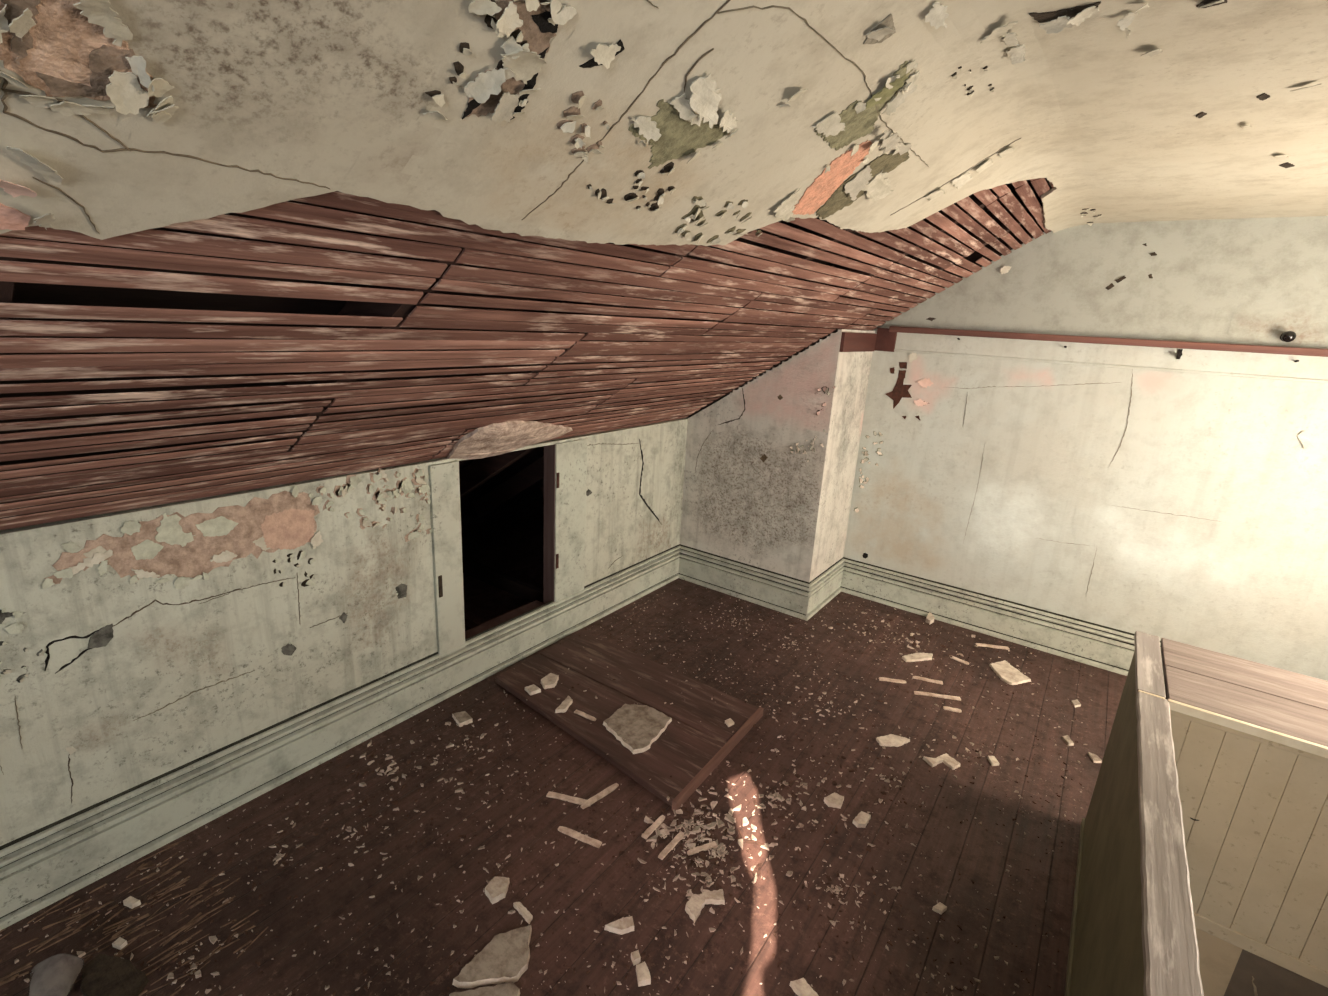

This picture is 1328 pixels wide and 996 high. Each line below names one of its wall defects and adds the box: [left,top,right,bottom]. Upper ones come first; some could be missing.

spalling [0,0,179,124]
crack [1,71,330,189]
peeling [423,0,577,122]
peeling [587,48,738,212]
crack [522,0,929,220]
spalling [774,60,920,222]
peeling [980,1,1101,64]
crack [33,177,99,233]
spalling [42,468,433,589]
crack [587,439,660,522]
leakage [629,329,841,566]
crack [0,700,22,775]